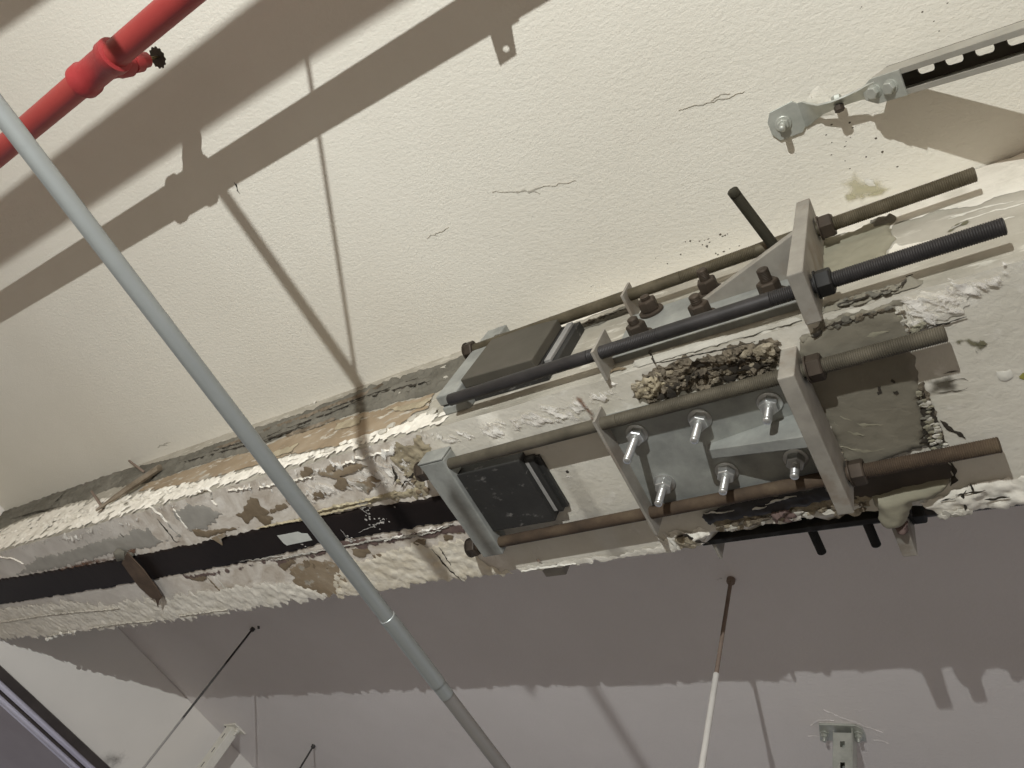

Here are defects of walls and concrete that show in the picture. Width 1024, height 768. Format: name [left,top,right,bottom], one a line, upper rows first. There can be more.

crack [681,93,738,110]
crack [497,180,576,194]
damp [847,179,883,200]
peeling [897,262,1006,333]
spalling [631,338,781,404]
spalling [255,355,466,458]
spalling [0,437,258,529]
peeling [390,435,432,503]
peeling [192,527,239,545]
peeling [333,569,359,600]
peeling [354,539,513,592]
spalling [671,487,872,549]